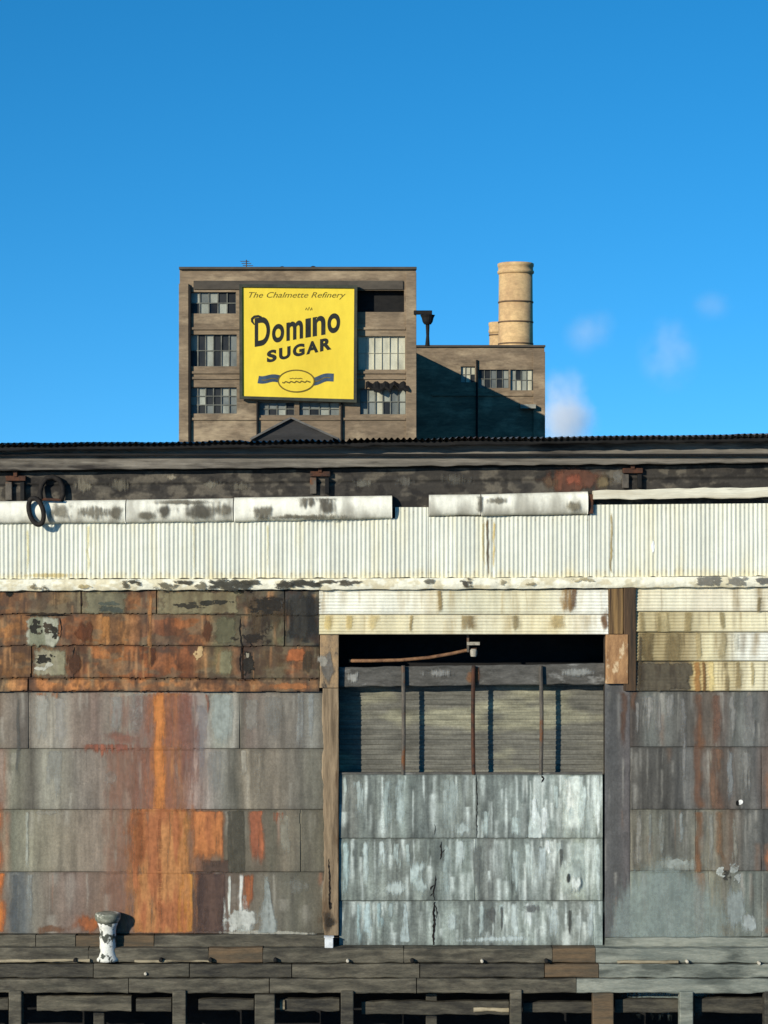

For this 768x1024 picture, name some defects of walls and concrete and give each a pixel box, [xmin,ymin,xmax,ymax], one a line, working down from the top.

water stain [259,498,347,520]
corrosion [544,467,608,492]
peeling [26,612,66,676]
water stain [552,589,576,628]
corrosion [86,693,223,933]
corrosion [242,876,253,910]
water stain [194,811,313,935]
corrosion [250,811,264,858]
water stain [357,842,427,942]
crack [430,824,445,945]
water stain [512,776,600,892]
corrosion [694,695,723,872]